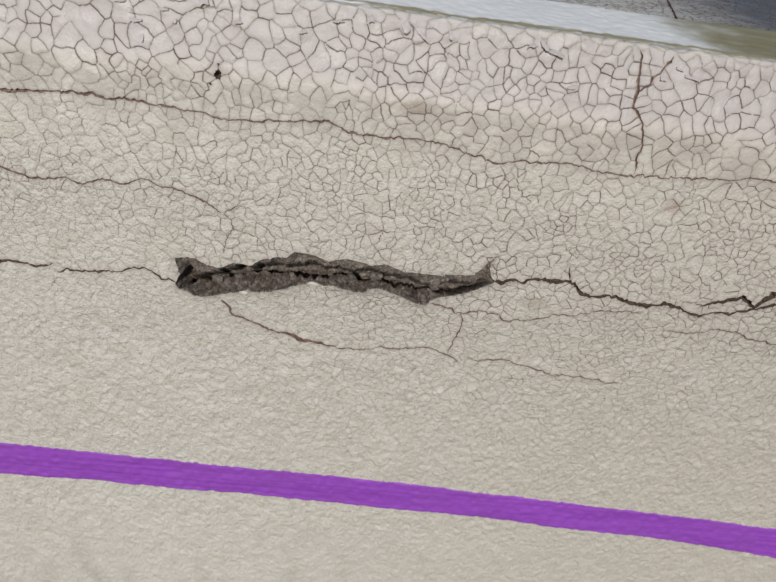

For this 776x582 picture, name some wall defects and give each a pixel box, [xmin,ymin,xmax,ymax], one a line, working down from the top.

spalling [175,252,495,306]
crack [0,0,776,384]